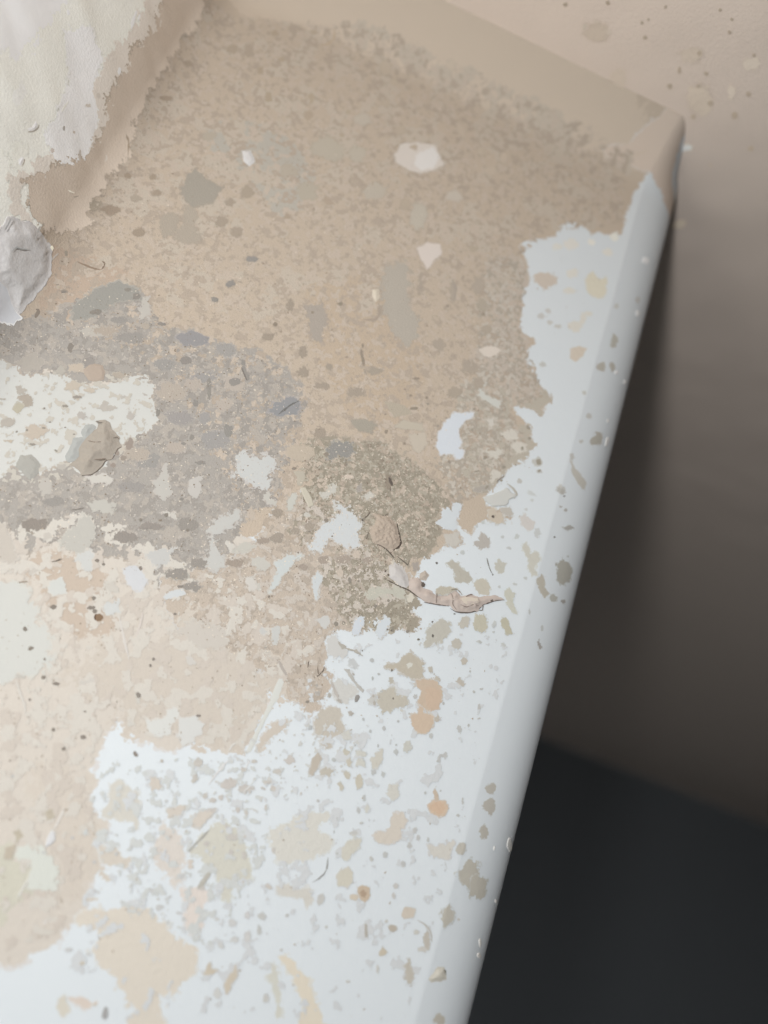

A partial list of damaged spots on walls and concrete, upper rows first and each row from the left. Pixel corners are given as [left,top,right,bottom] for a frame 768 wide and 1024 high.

peeling [242,150,255,166]